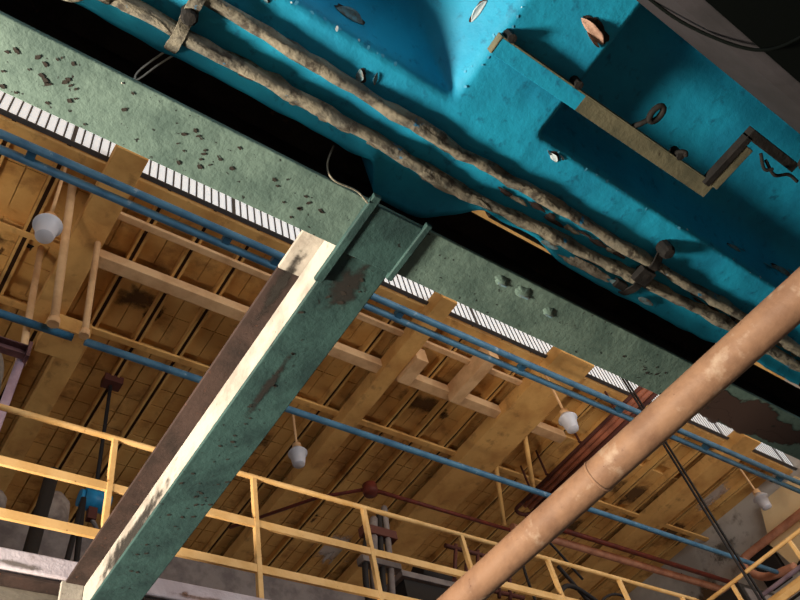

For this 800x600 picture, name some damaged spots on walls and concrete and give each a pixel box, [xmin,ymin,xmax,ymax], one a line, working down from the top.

peeling [334,3,365,25]
peeling [469,0,487,22]
peeling [581,15,609,48]